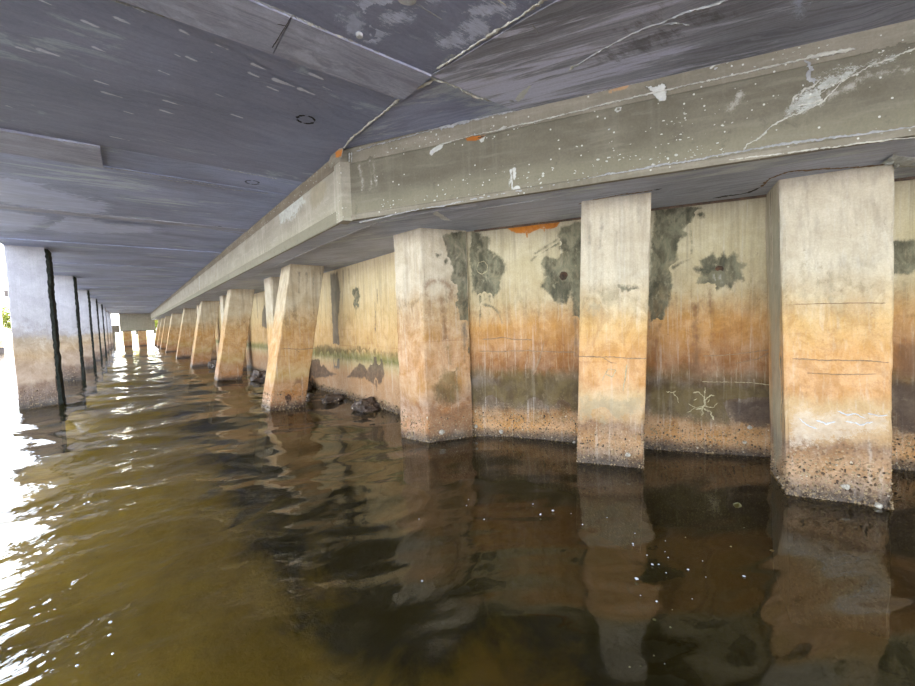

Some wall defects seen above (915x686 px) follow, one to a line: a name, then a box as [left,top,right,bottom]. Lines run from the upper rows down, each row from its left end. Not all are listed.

damp [254,0,556,102]
damp [343,84,534,152]
damp [439,48,855,145]
crack [569,0,729,71]
crack [776,0,822,25]
crack [743,42,915,151]
damp [467,231,509,328]
rust [506,222,560,238]
damp [528,220,581,360]
damp [646,205,752,379]
damp [893,235,915,279]